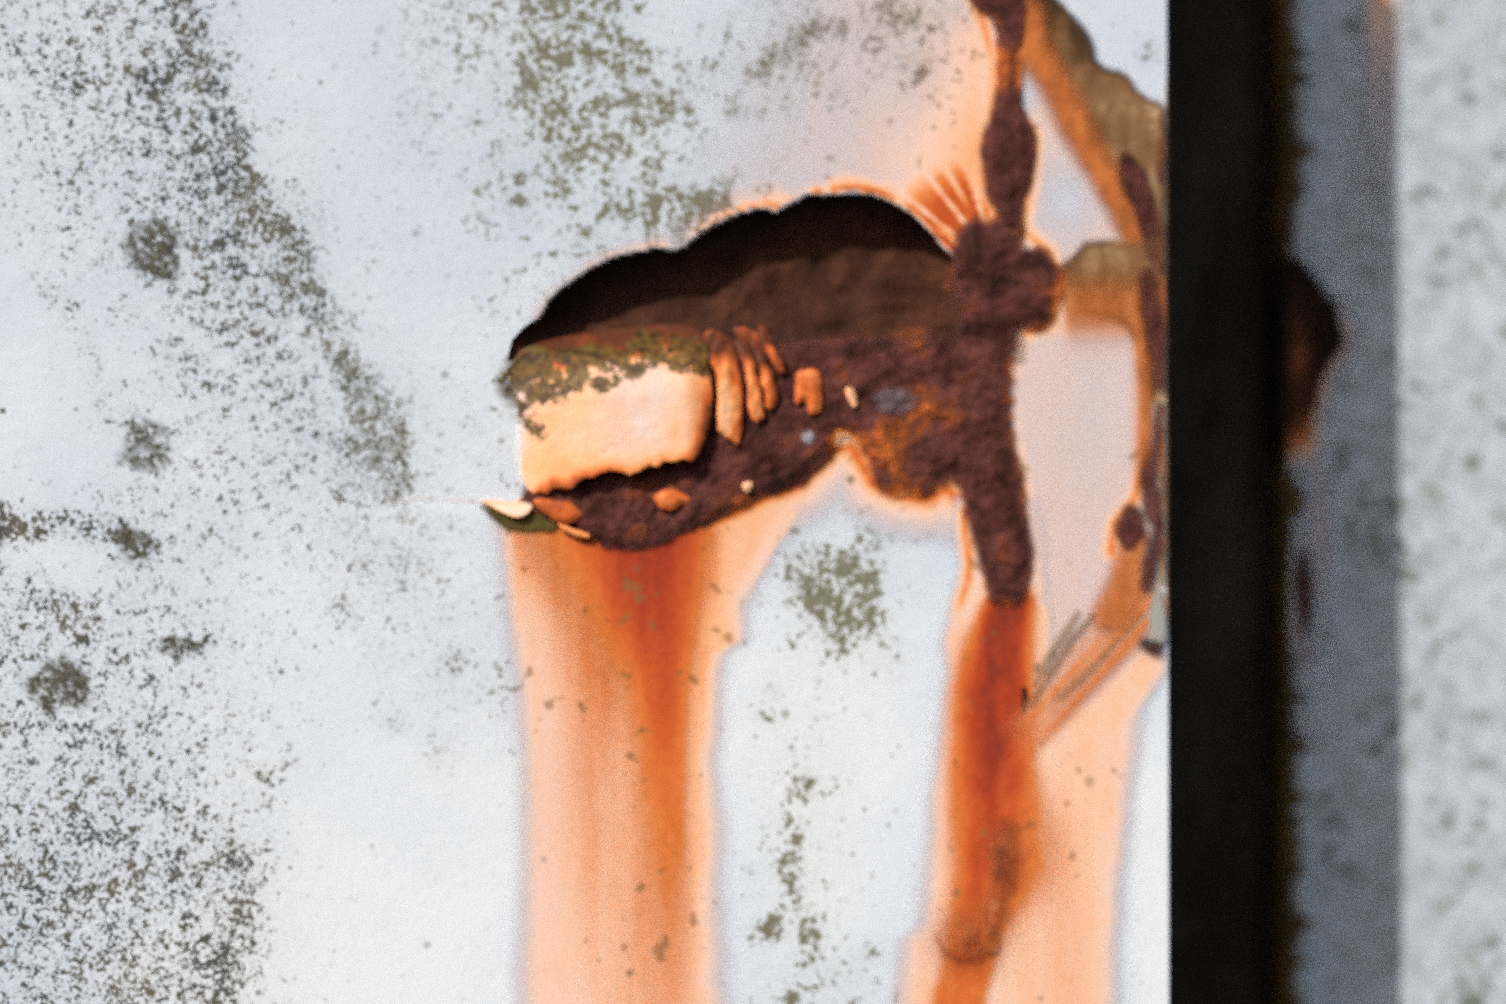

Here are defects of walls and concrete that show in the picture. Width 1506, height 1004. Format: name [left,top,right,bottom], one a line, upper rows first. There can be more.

leakage [119,213,178,279]
spalling [508,192,961,538]
leakage [116,417,172,485]
rust [495,0,1170,1004]
leakage [114,528,159,566]
leakage [161,636,202,655]
leakage [24,655,90,719]